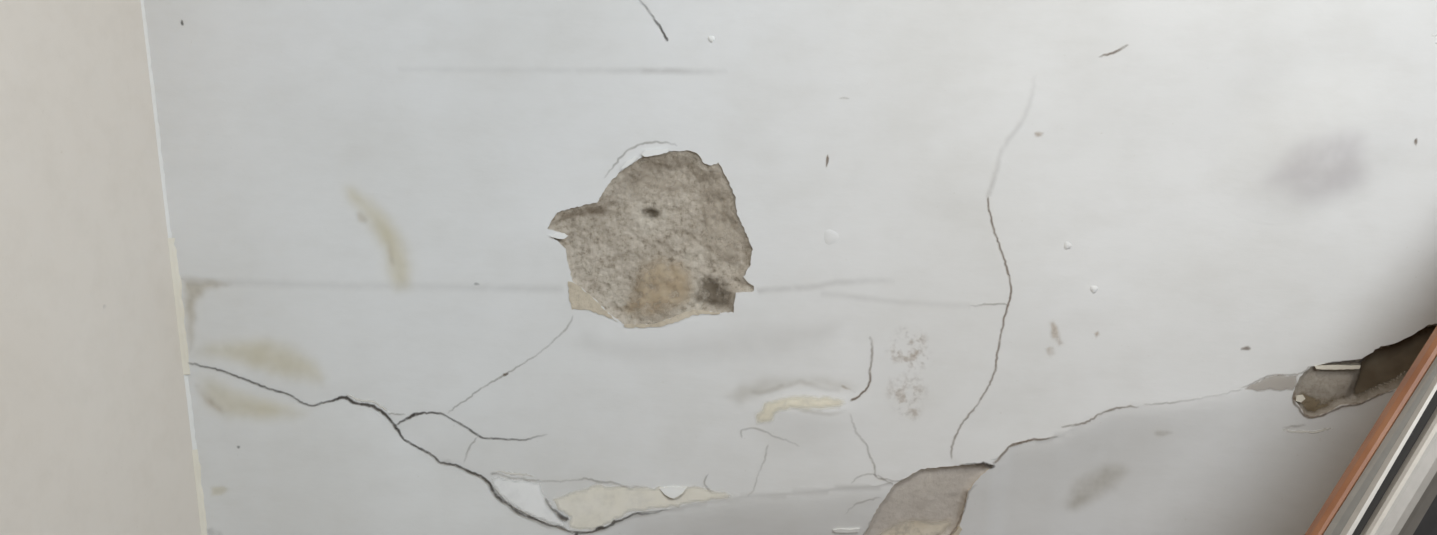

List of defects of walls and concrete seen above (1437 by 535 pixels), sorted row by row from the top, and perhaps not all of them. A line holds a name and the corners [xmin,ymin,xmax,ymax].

spalling [547,149,754,328]
crack [988,200,1012,361]
crack [208,367,565,529]
peeling [493,478,727,535]
spalling [833,462,994,535]
spalling [1248,324,1437,433]